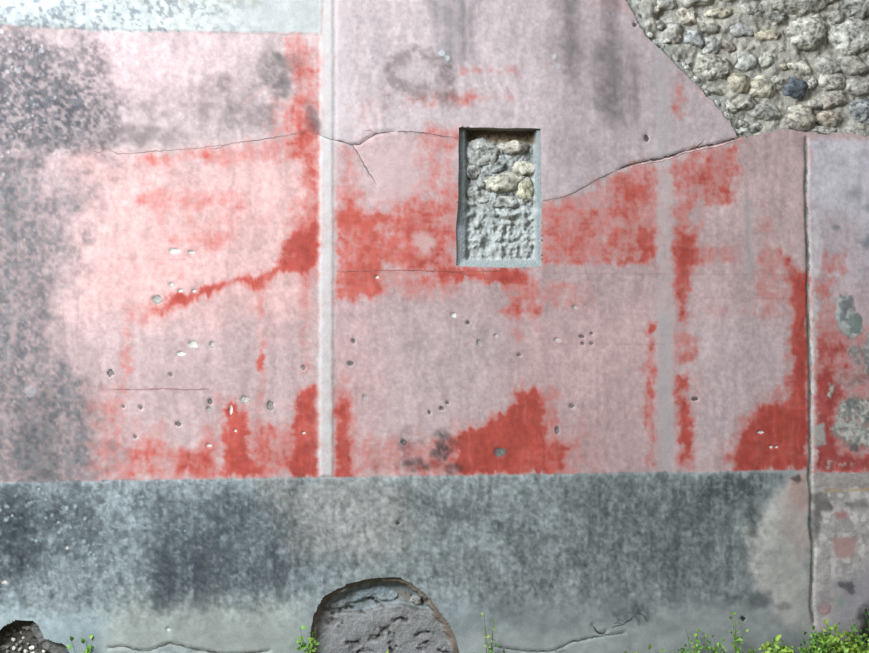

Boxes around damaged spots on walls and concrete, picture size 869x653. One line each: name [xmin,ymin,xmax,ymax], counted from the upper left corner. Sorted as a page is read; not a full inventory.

crack [92,130,455,182]
crack [543,138,738,201]
leakage [0,160,89,481]
peeling [812,398,869,451]
leakage [697,477,762,508]
leakage [152,493,291,602]
spalling [0,620,70,653]
crack [108,642,218,653]
crack [489,613,648,652]